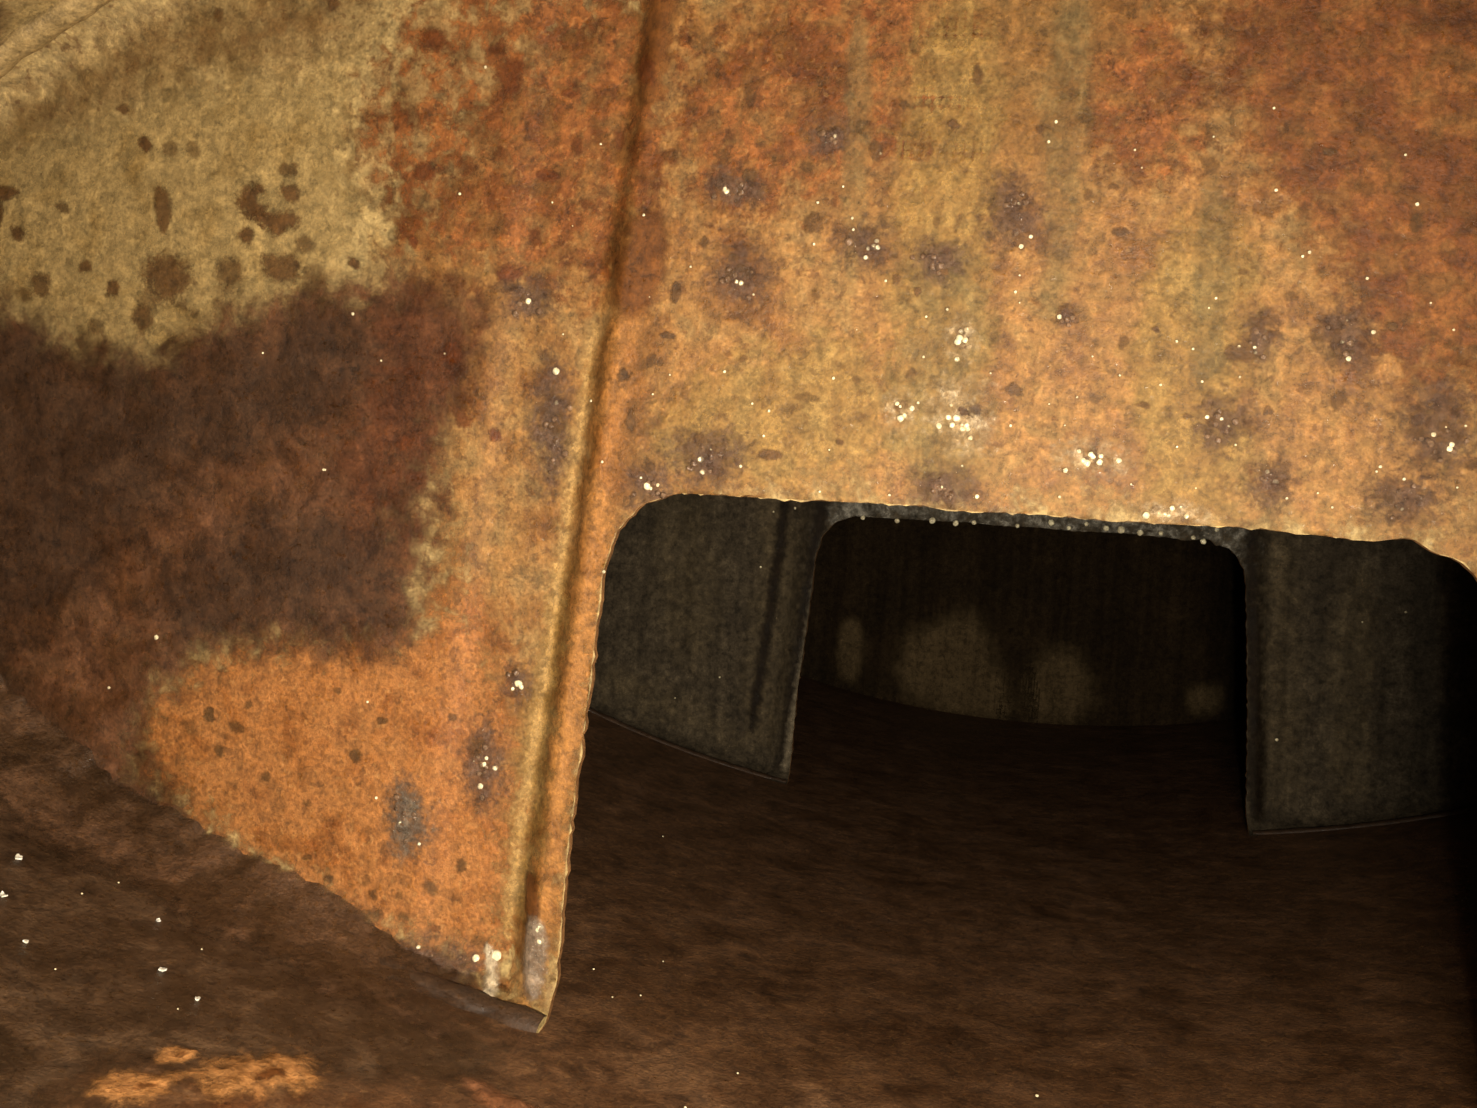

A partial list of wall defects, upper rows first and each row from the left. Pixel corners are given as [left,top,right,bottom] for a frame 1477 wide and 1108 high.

rust [390,782,426,854]
rust [397,940,469,982]